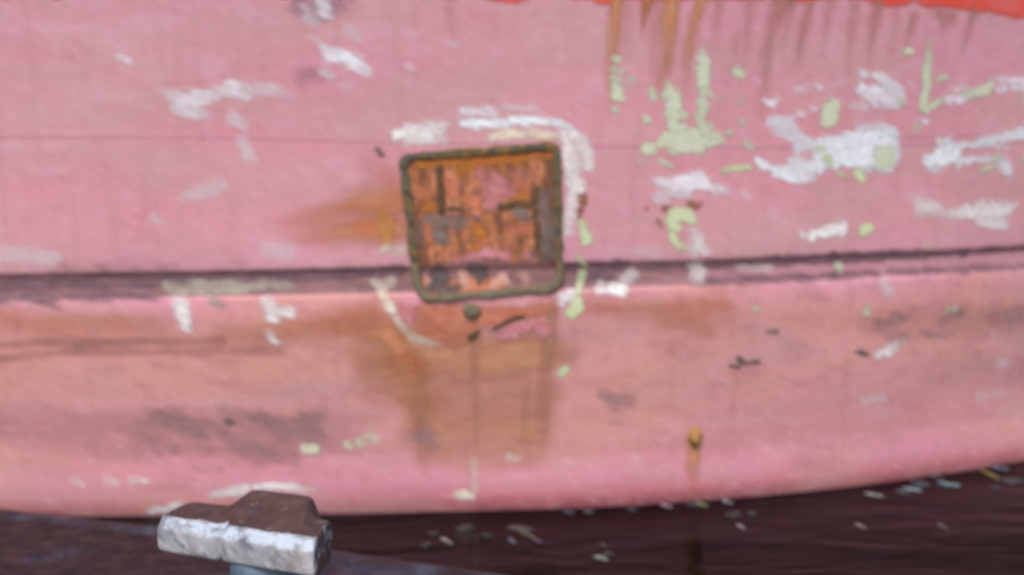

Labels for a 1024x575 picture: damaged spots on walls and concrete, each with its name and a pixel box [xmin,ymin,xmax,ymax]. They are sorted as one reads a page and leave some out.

peeling [169,79,253,120]
peeling [319,44,373,76]
corrosion [325,151,559,441]
peeling [391,105,629,319]
corrosion [642,0,706,57]
peeling [640,45,1024,255]